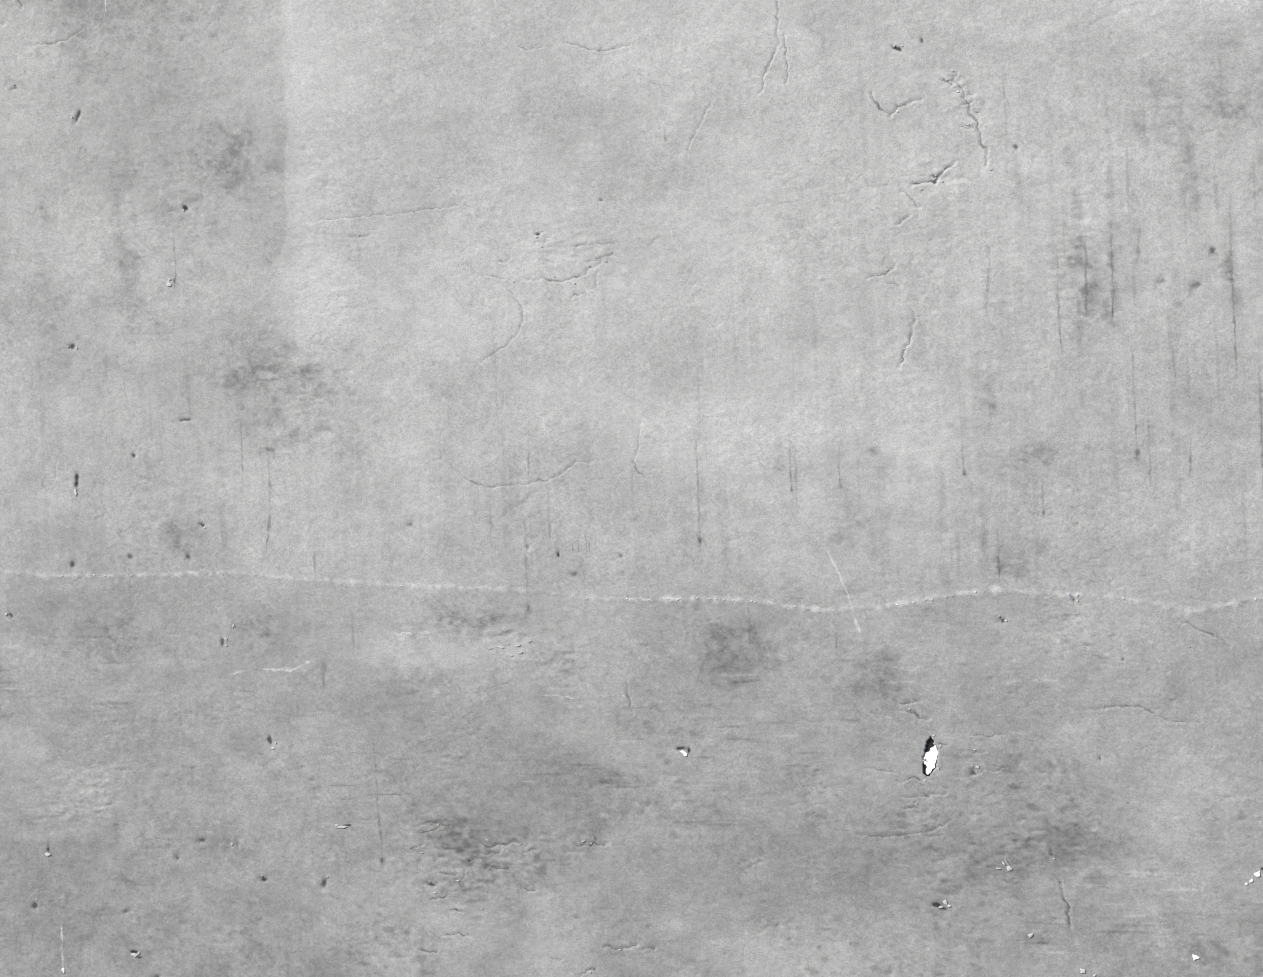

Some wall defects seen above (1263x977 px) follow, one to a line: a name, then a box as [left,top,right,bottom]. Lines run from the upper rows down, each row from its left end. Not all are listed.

flaking render [923,735,941,781]